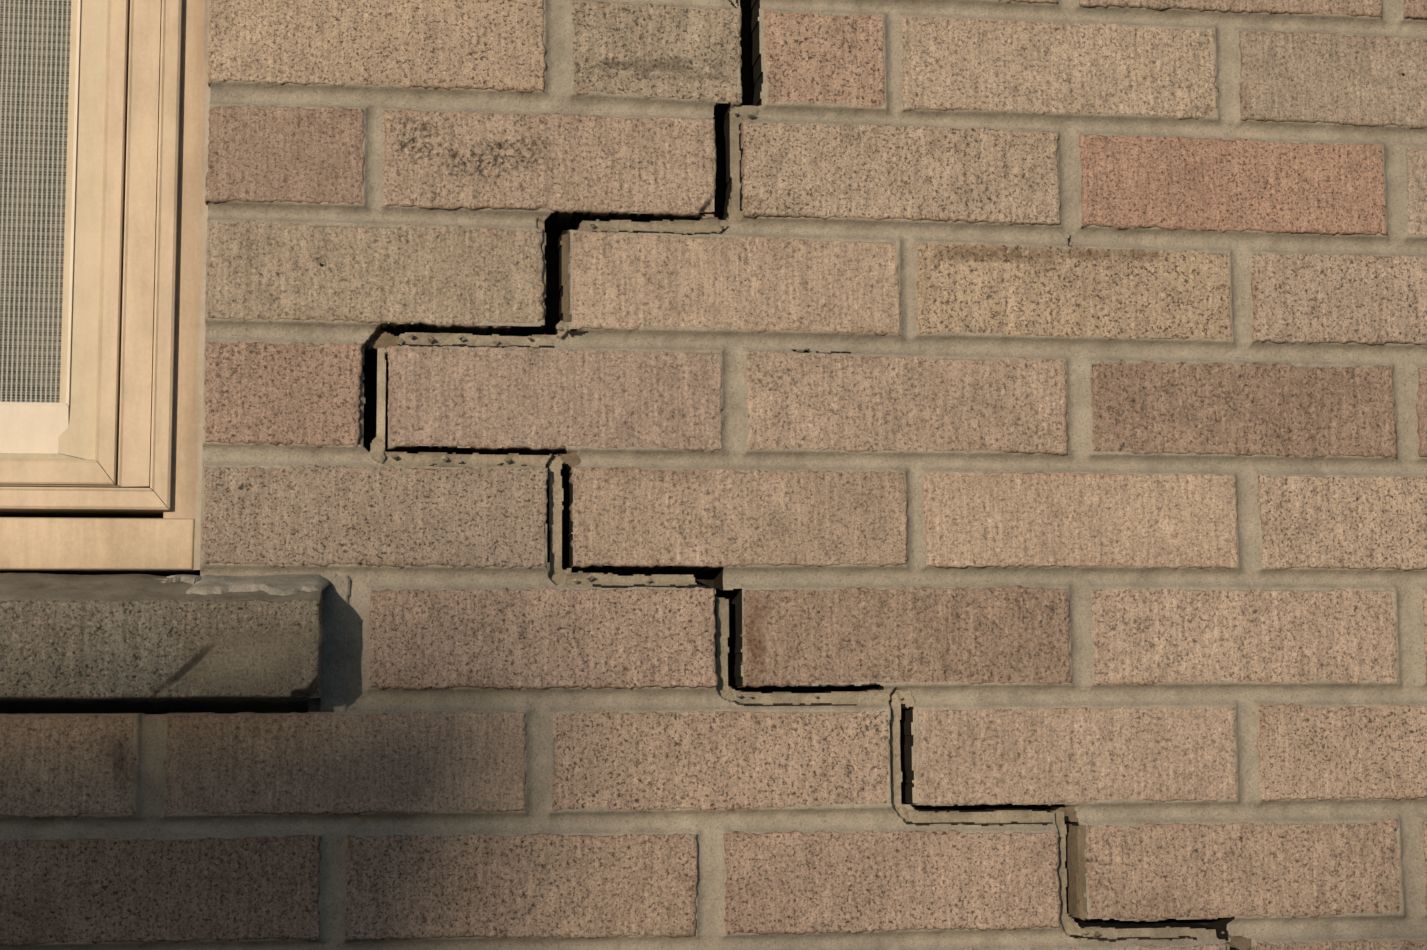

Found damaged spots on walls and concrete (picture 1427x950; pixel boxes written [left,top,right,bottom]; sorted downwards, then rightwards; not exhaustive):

crack [354,0,1255,950]